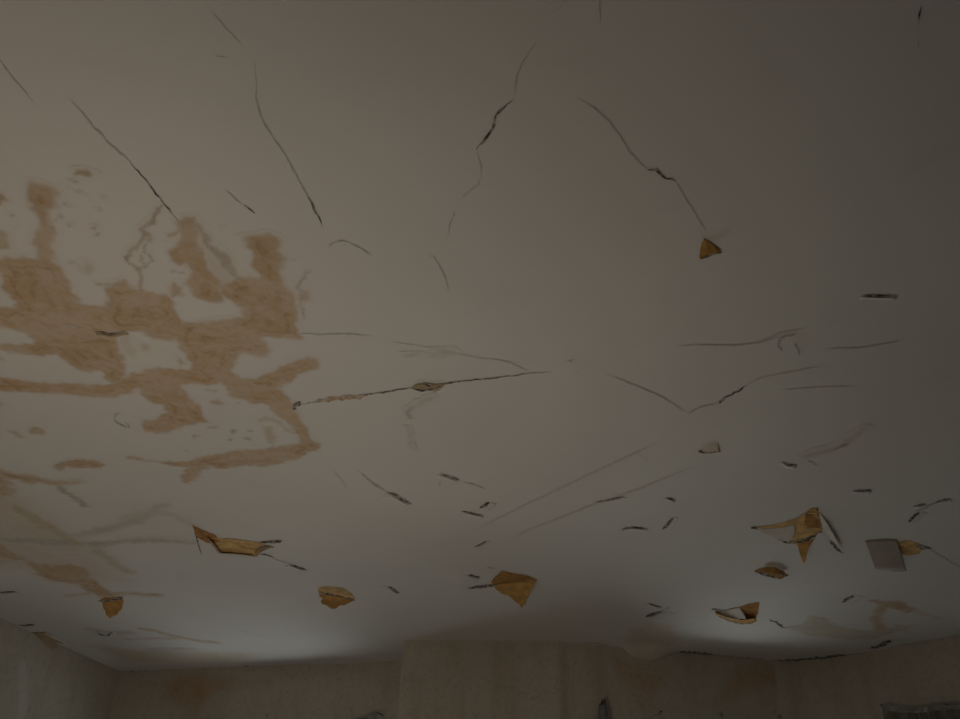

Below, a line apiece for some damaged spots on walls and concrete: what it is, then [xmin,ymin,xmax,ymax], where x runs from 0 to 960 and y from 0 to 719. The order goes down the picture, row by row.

crack [74,104,176,218]
crack [213,14,370,255]
crack [427,43,536,291]
crack [576,97,705,230]
leakage [0,165,327,485]
crack [293,388,413,410]
crack [297,333,578,385]
crack [610,342,896,414]
leakage [779,598,949,641]